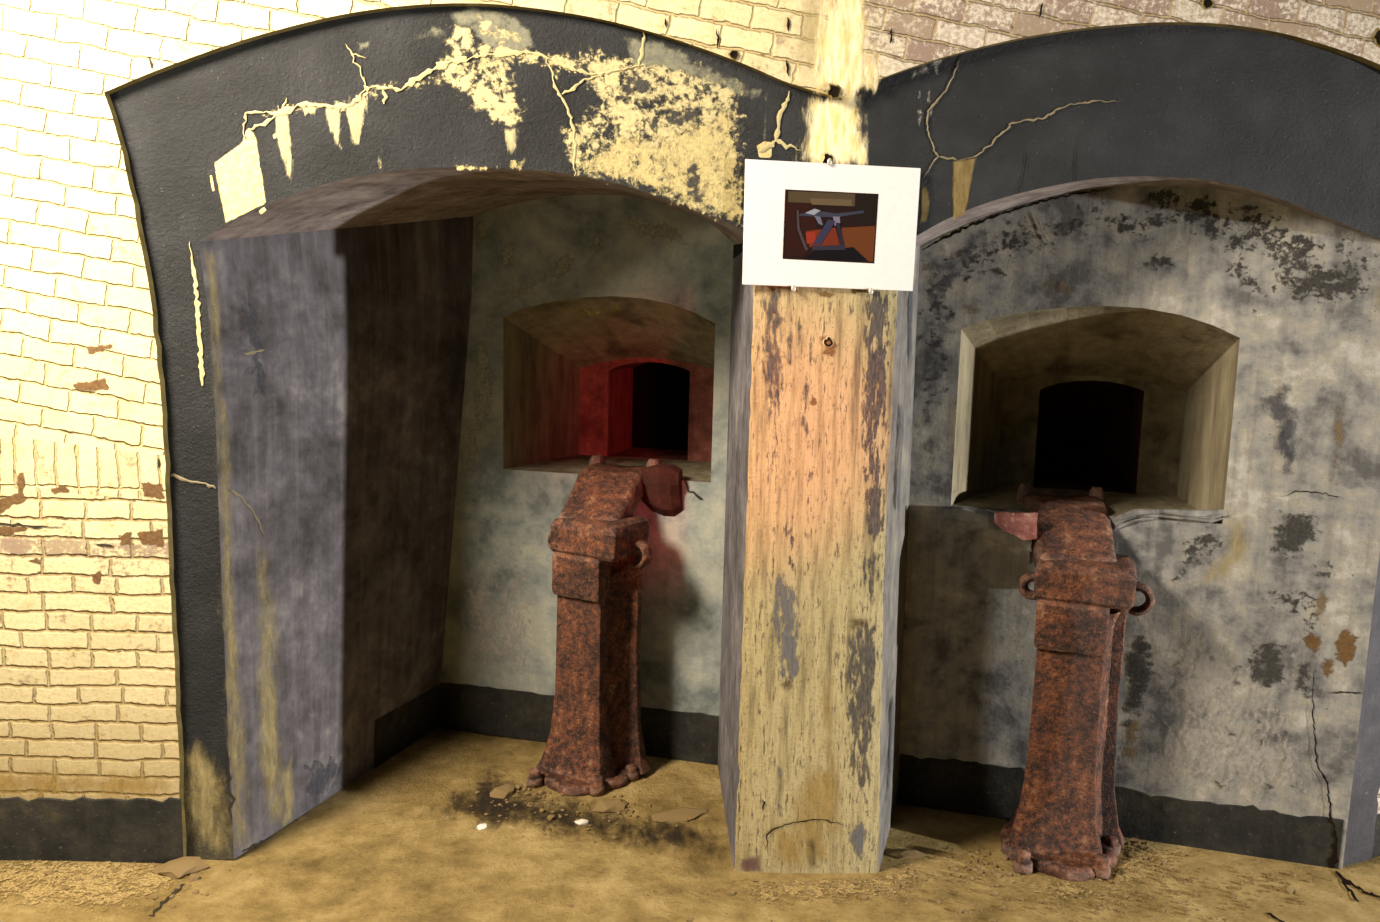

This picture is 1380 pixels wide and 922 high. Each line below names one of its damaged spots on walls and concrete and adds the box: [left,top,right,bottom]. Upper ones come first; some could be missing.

water stain [803,0,878,165]
peeling [210,128,277,222]
crack [922,60,1118,250]
water stain [918,187,1377,414]
spalling [73,378,109,391]
spalling [0,472,27,536]
spalling [119,529,164,547]
spalling [141,482,165,499]
water stain [1173,527,1244,581]
water stain [1269,510,1335,632]
corrosion [1303,629,1359,677]
crack [1312,663,1380,902]